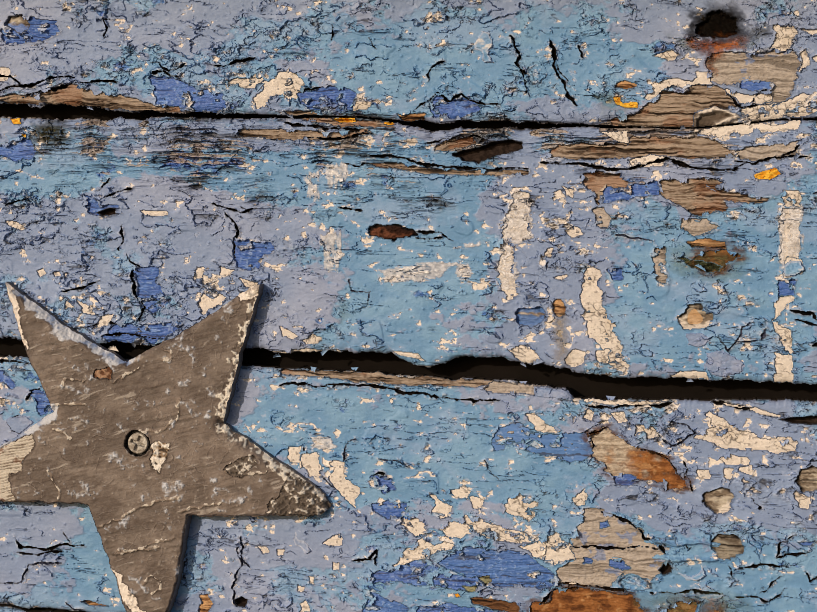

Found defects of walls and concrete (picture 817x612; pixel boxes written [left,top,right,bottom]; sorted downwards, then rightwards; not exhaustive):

peeling [0,137,36,165]
peeling [0,15,62,51]
peeling [0,68,398,143]
crack [510,35,527,93]
crack [284,122,807,172]
crack [549,41,577,106]
peeling [546,23,817,240]
peeling [132,263,165,313]
peeling [565,261,629,368]
peeling [770,190,803,382]
peeling [363,472,668,612]